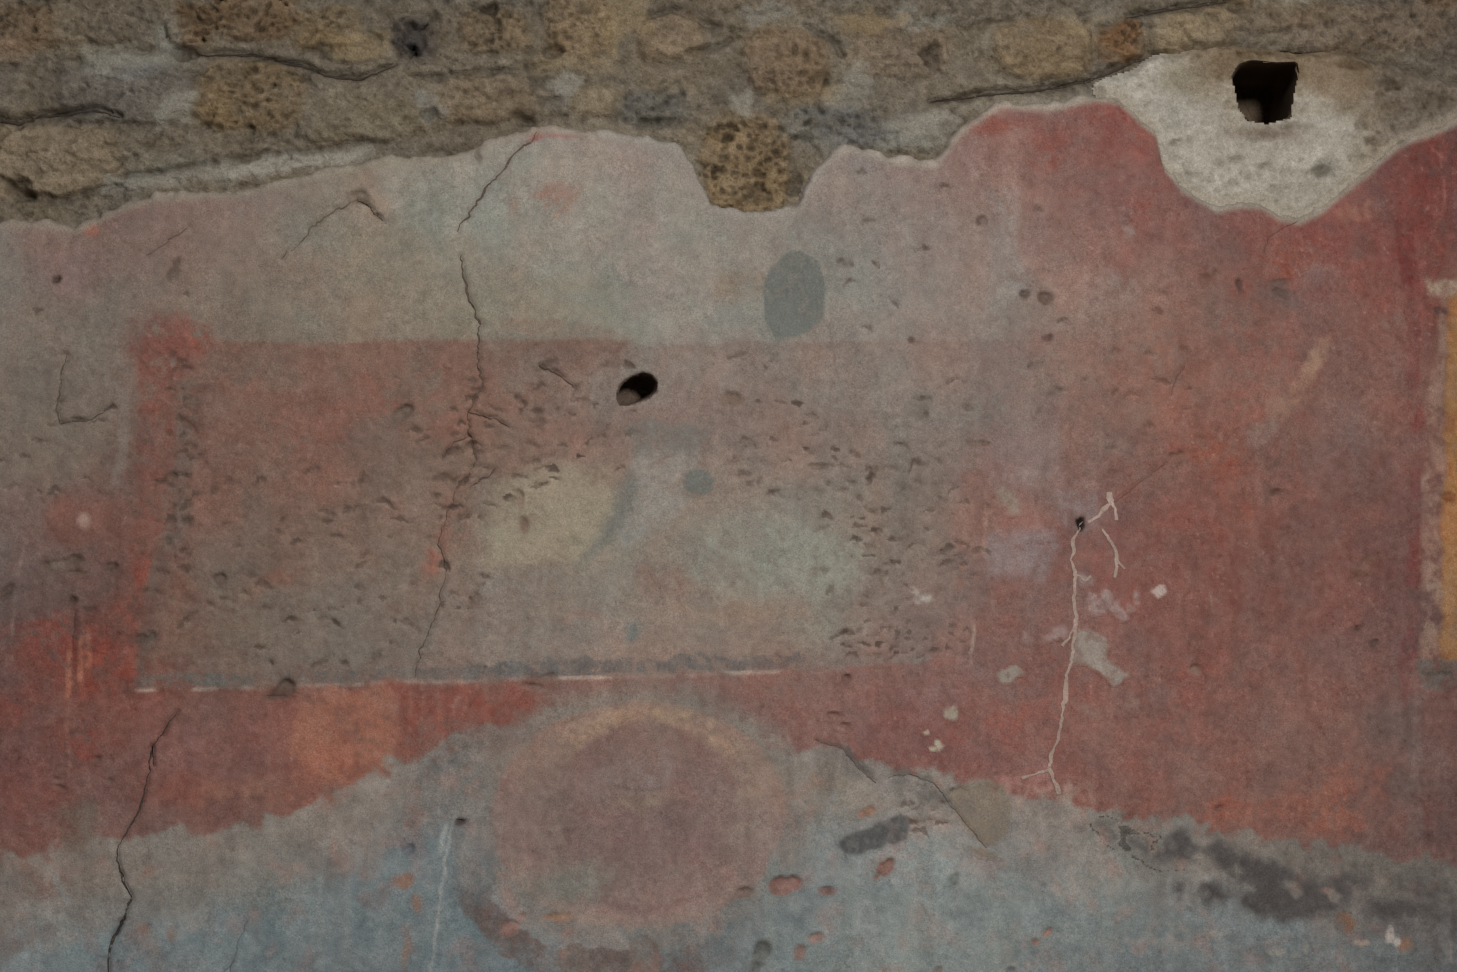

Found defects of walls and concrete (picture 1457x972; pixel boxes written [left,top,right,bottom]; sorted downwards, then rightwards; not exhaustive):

spalling [342,187,387,224]
spalling [1091,45,1457,218]
crack [415,132,537,676]
damp [998,483,1118,591]
crack [108,711,178,972]
damp [760,825,783,972]